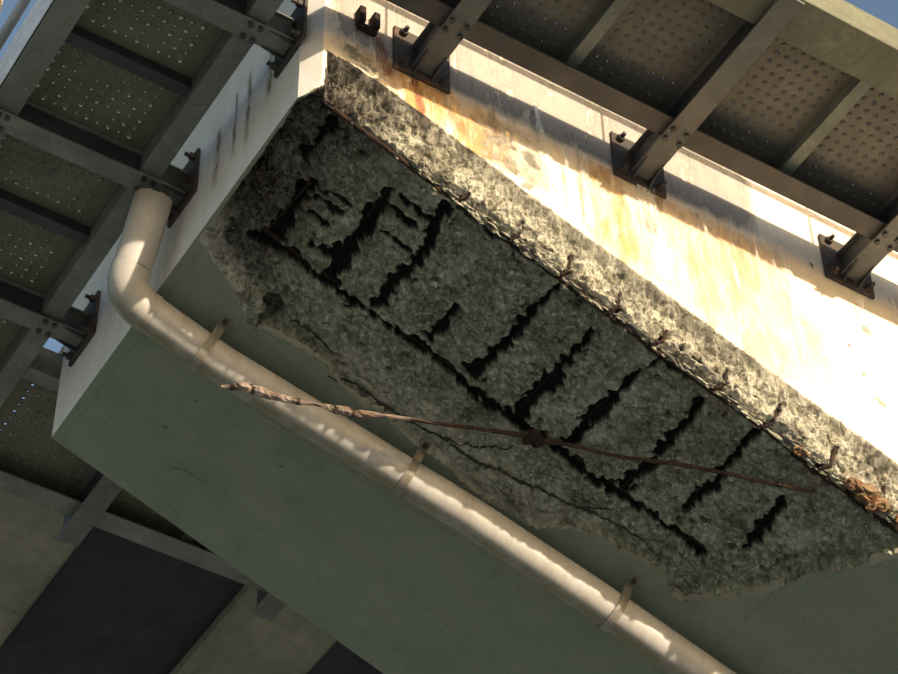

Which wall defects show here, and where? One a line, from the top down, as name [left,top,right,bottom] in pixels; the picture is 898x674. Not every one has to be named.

spalling [199,43,898,602]
corrosion [592,165,639,263]